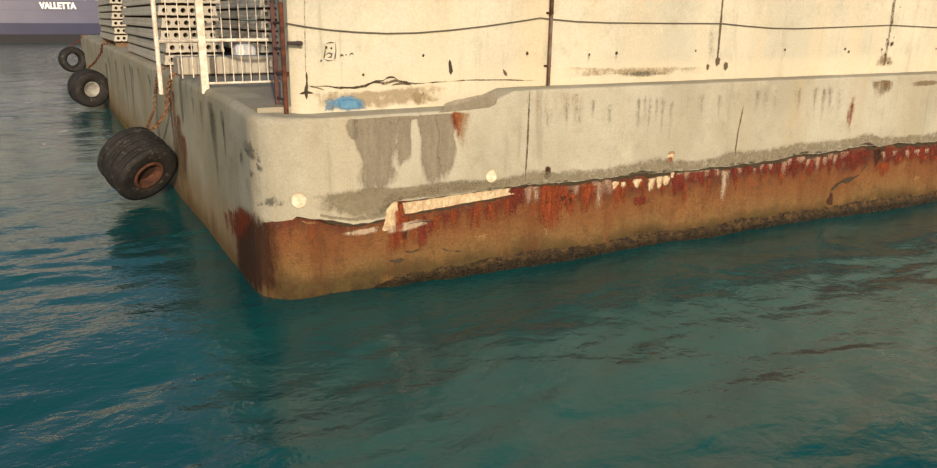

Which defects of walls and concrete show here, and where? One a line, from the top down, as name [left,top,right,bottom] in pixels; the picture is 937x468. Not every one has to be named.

corrosion [169,92,187,179]
corrosion [225,208,278,292]
crack [299,217,384,227]
corrosion [390,188,525,250]
corrosion [452,112,466,136]
corrosion [539,167,596,228]
leakage [320,93,937,221]
crack [409,106,937,205]
corrosion [661,170,716,199]
corrosion [732,145,937,188]